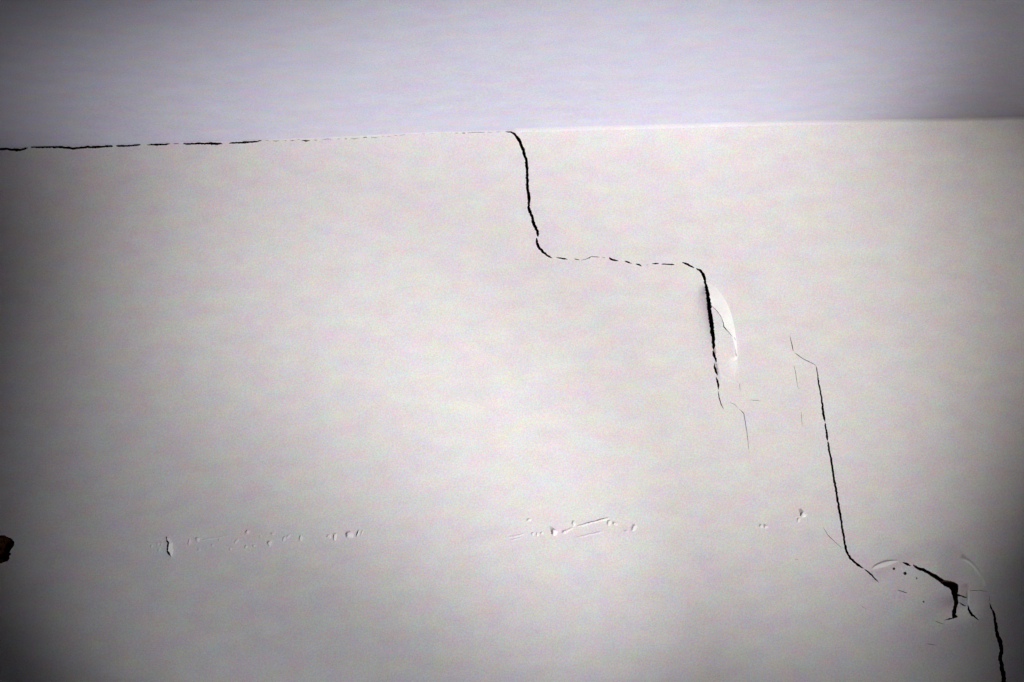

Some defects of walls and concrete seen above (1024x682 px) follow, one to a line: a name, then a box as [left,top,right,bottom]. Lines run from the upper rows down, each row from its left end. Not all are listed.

crack [0,139,324,152]
crack [471,131,759,448]
crack [790,338,878,581]
crack [989,596,1006,682]